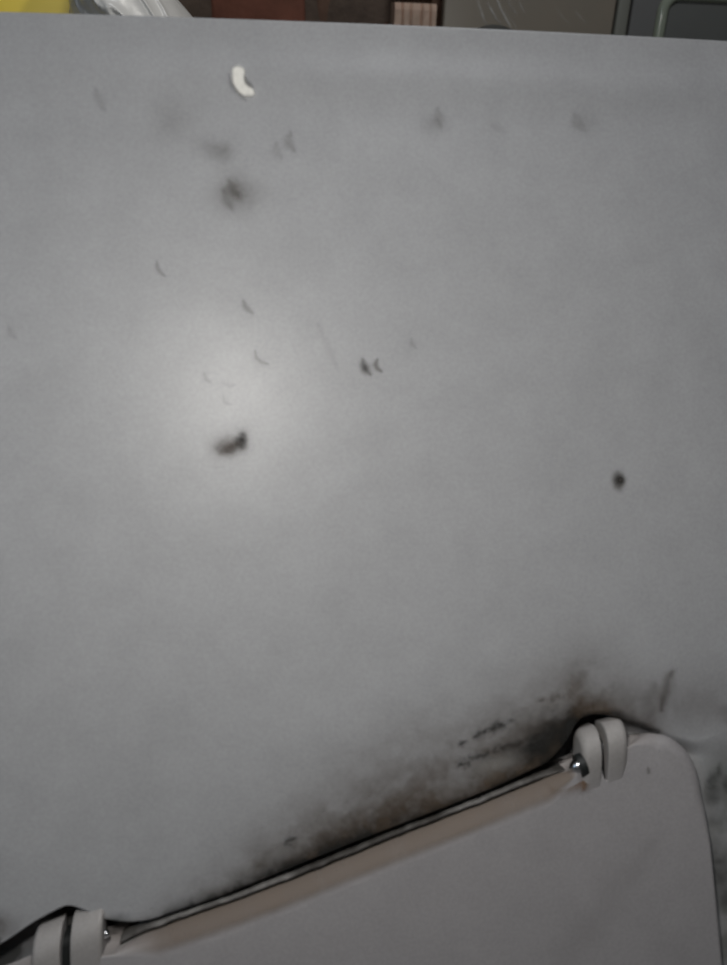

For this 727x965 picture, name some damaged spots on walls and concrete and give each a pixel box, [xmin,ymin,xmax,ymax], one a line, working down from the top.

water stain [223,434,245,451]